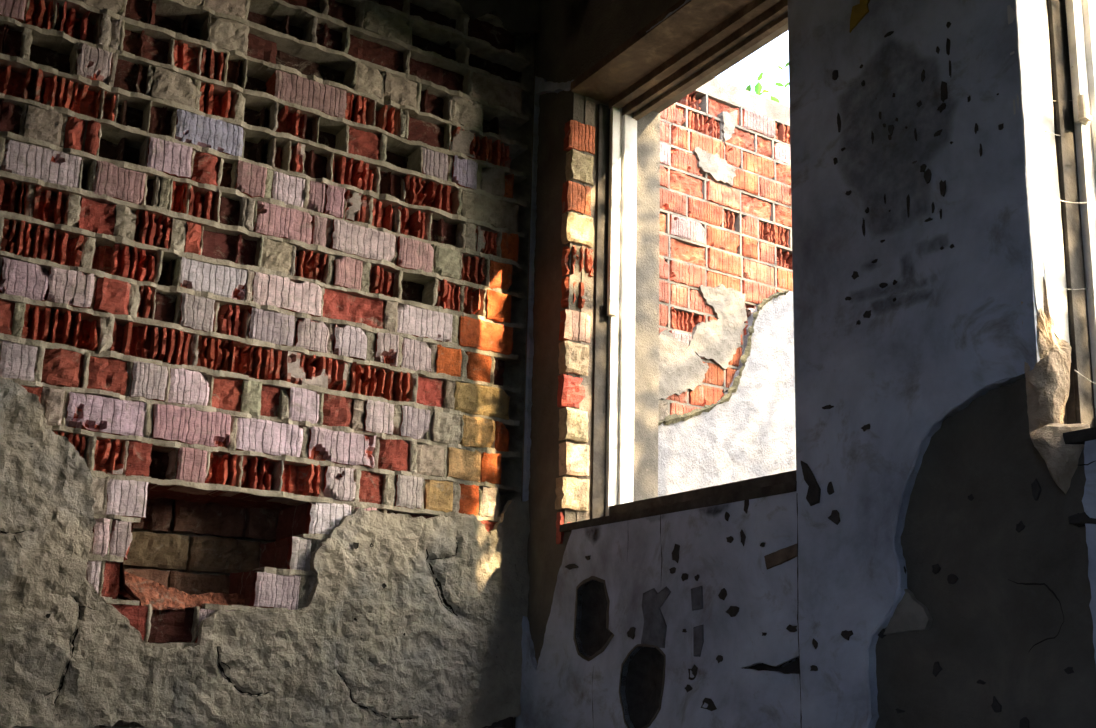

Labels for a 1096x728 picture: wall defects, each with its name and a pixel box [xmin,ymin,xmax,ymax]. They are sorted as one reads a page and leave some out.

spalling [658,89,793,426]
spalling [0,0,590,664]
spalling [801,461,834,506]
spalling [865,276,1096,728]
spalling [669,544,700,581]
spalling [760,542,797,569]
spalling [573,576,614,662]
spalling [718,588,740,617]
spalling [619,627,666,728]
spalling [745,656,818,674]
spalling [93,720,144,728]
spalling [701,698,717,711]